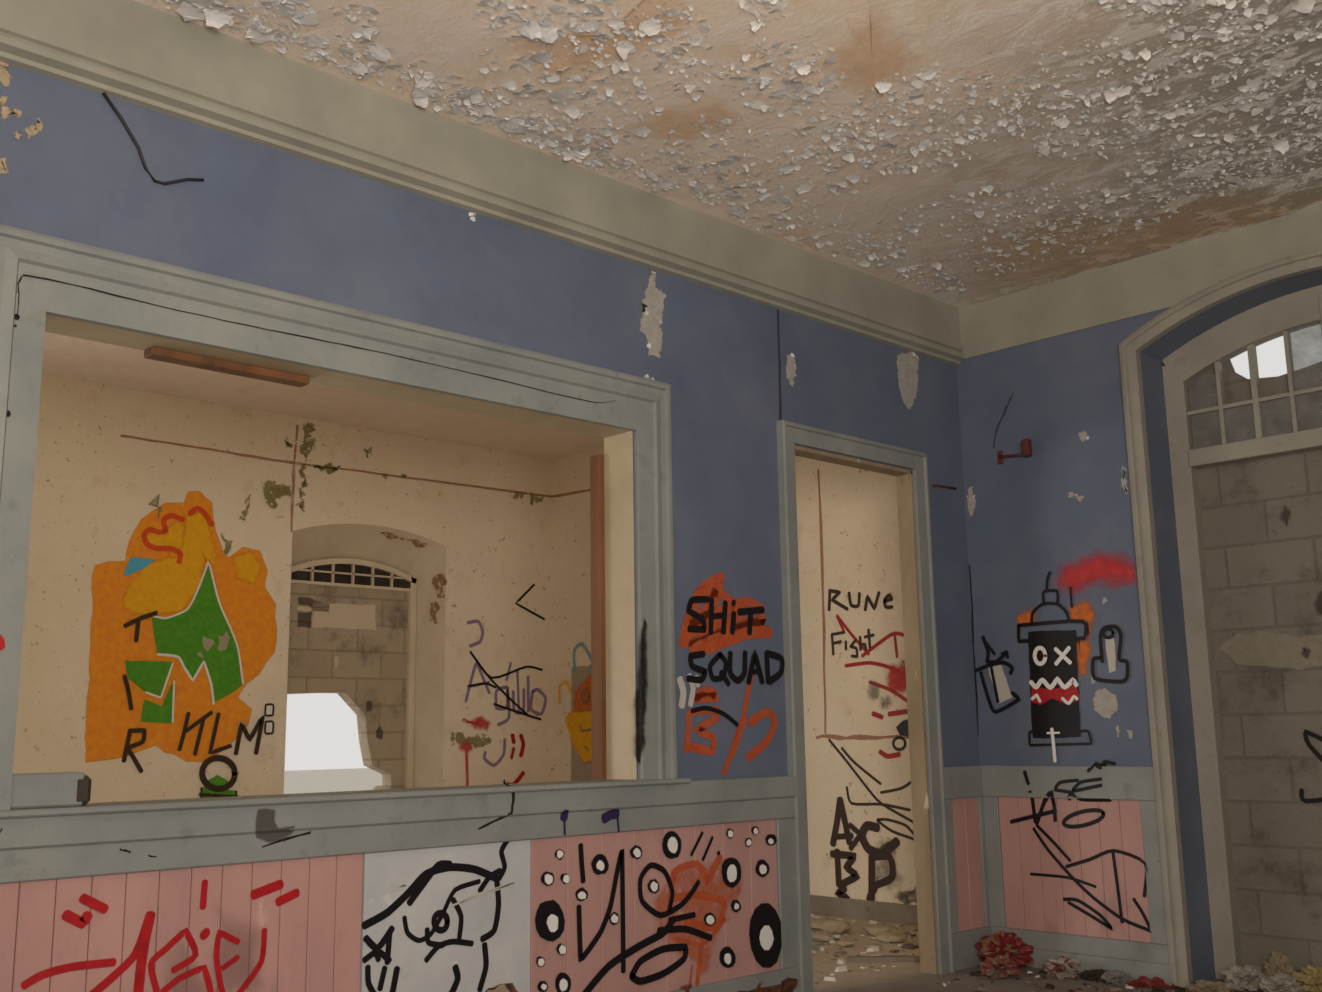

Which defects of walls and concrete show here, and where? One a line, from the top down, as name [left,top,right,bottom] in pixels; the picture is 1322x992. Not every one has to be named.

peeling [0,61,43,139]
peeling [0,157,8,174]
peeling [153,0,1322,293]
peeling [640,271,666,359]
peeling [786,353,796,387]
peeling [896,351,919,409]